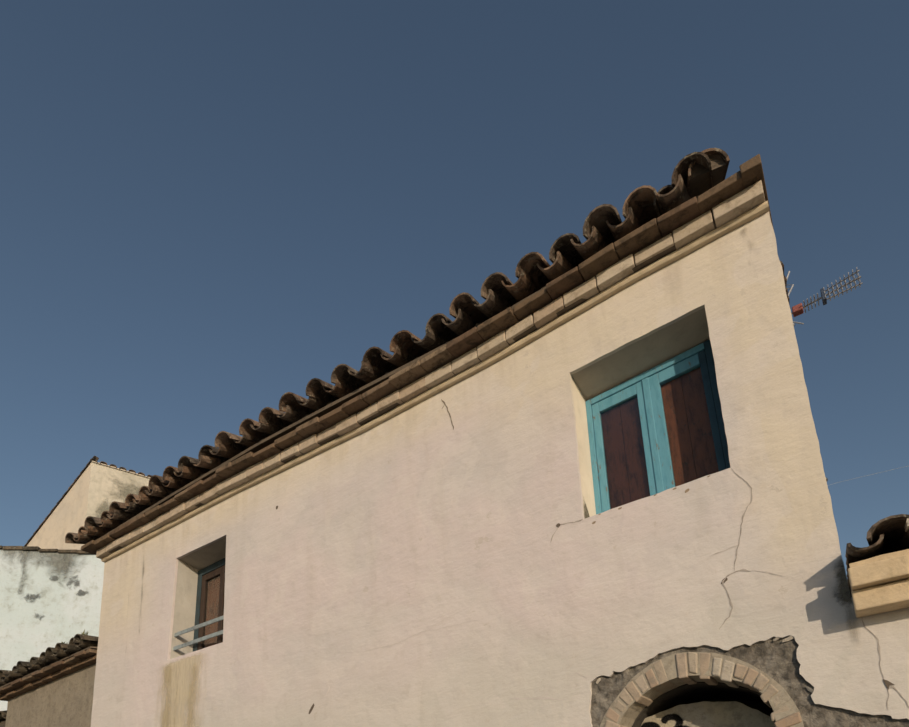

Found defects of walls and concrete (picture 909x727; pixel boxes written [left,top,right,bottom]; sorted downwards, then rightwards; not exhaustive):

leakage [4,550,81,575]
crack [711,468,782,629]
leakage [162,656,200,727]
spalling [590,635,909,727]
crack [862,620,909,709]